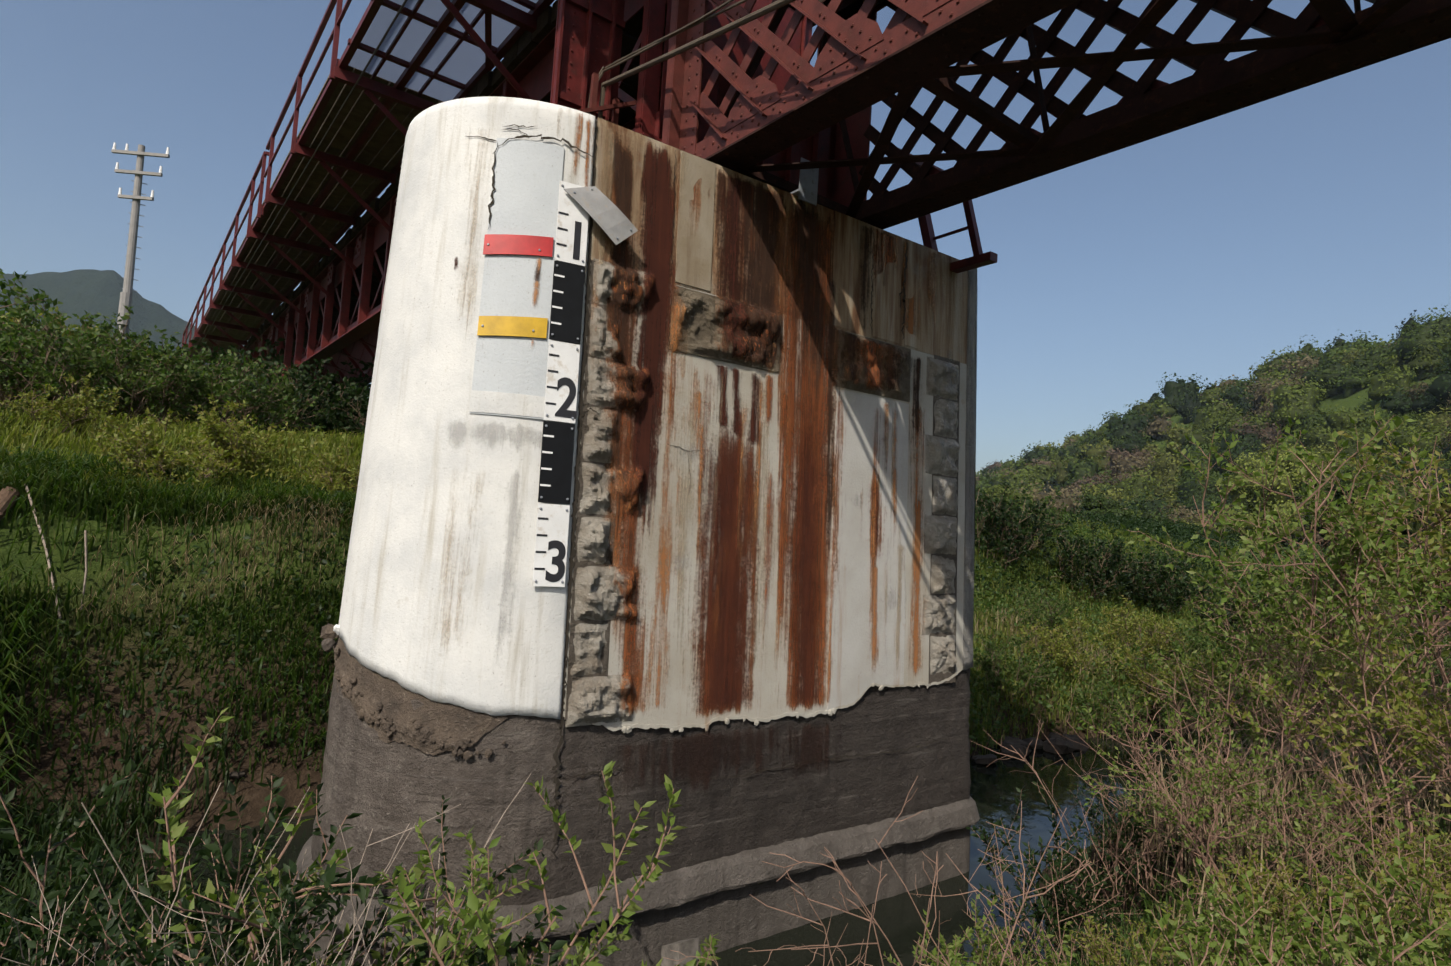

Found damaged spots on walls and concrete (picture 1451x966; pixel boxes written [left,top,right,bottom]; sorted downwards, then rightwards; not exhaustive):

crack [466,121,630,857]
corrosion [574,114,590,187]
corrosion [595,135,849,716]
corrosion [870,404,897,661]